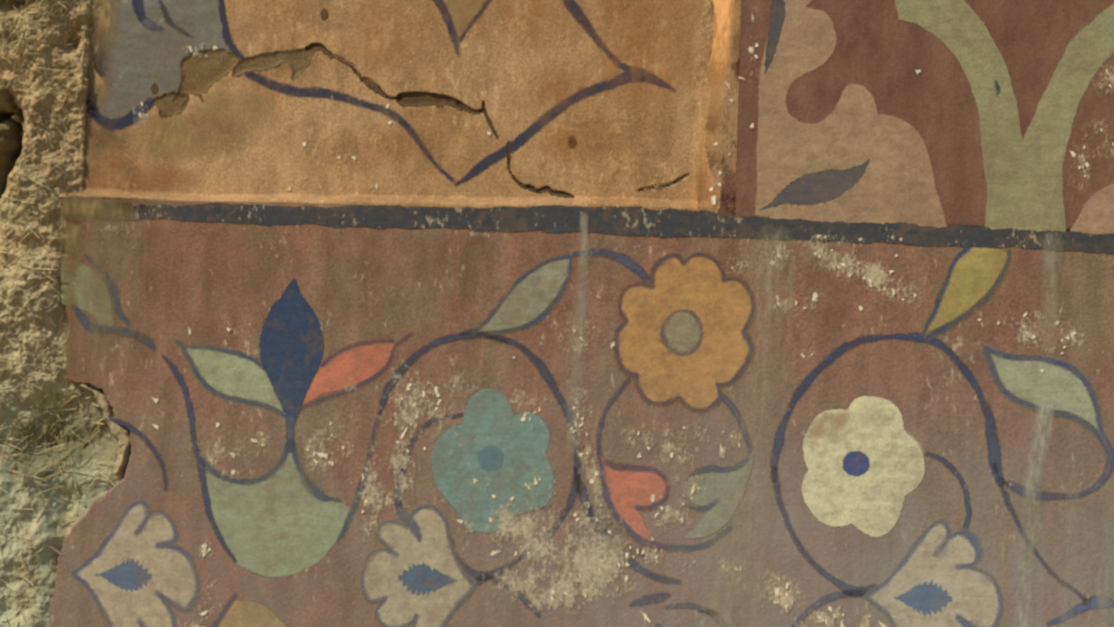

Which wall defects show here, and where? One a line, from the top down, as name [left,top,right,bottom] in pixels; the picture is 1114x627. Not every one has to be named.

flaking render [133,45,315,119]
crack [305,43,396,100]
crack [459,100,574,198]
crack [637,173,689,192]
flaking render [73,382,131,477]